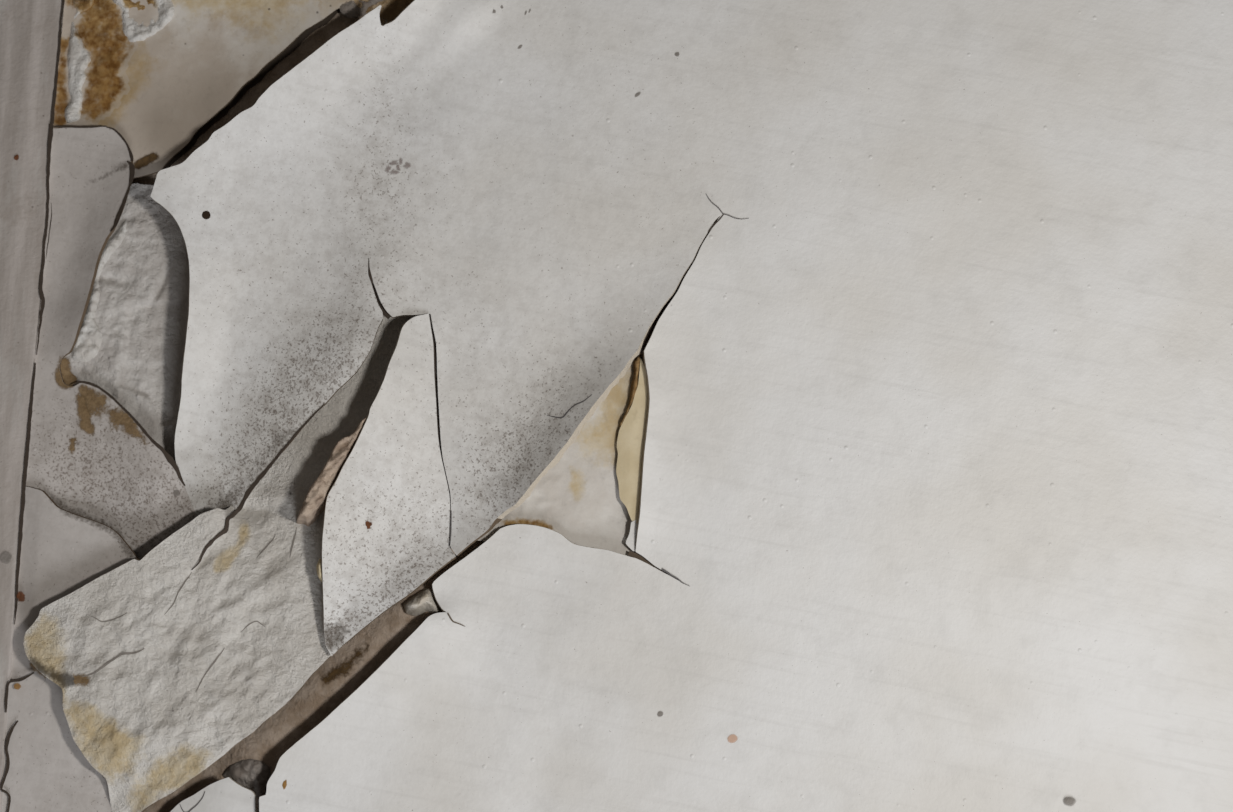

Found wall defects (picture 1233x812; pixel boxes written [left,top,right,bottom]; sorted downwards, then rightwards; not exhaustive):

water stain [359,0,413,24]
crack [368,262,391,319]
crack [640,194,748,354]
peeling [2,0,721,812]
crack [429,316,452,548]